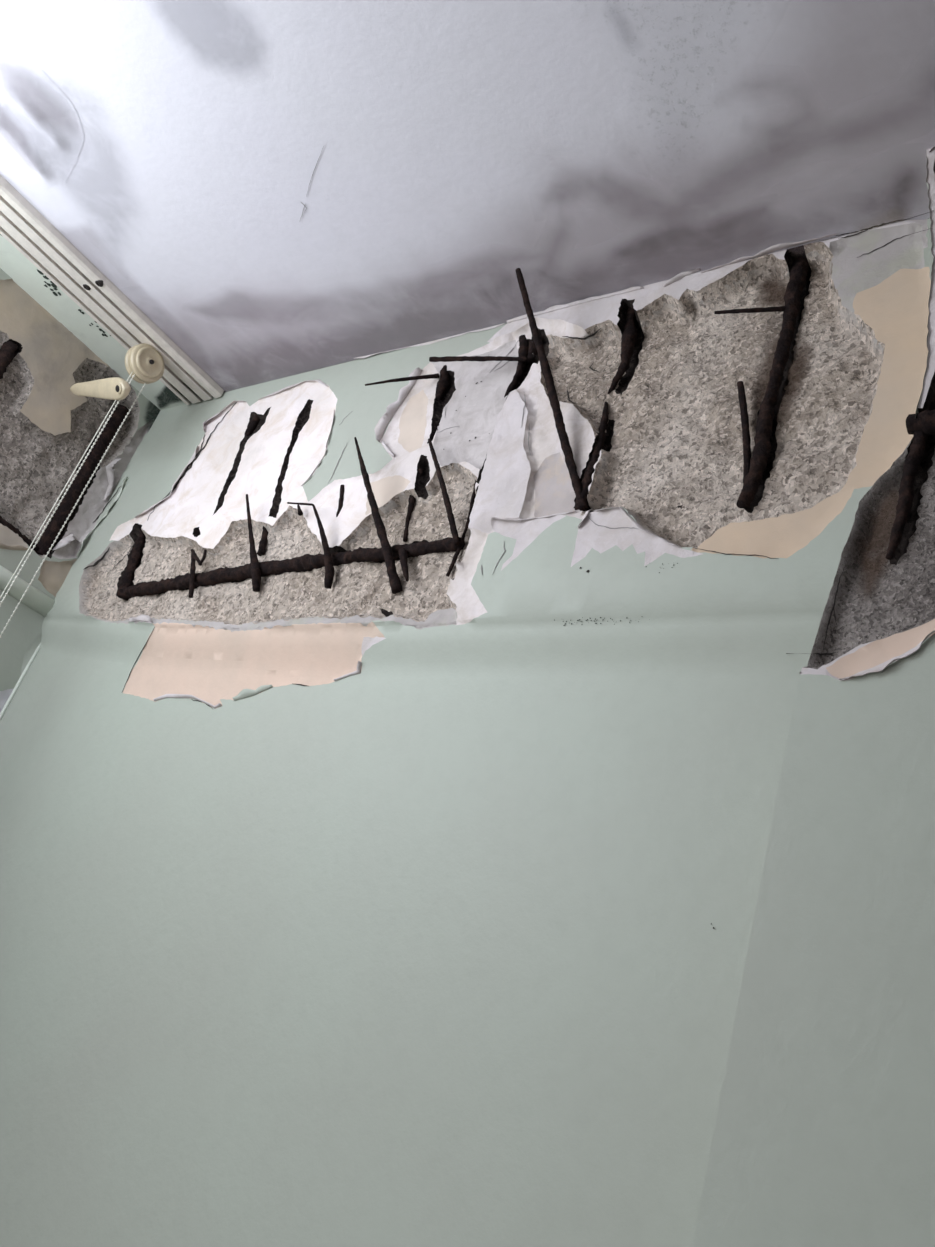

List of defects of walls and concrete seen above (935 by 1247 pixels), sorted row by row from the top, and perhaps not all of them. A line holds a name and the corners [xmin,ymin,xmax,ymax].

spalling [0,146,935,709]
rust [754,337,779,424]
rust [776,347,807,422]